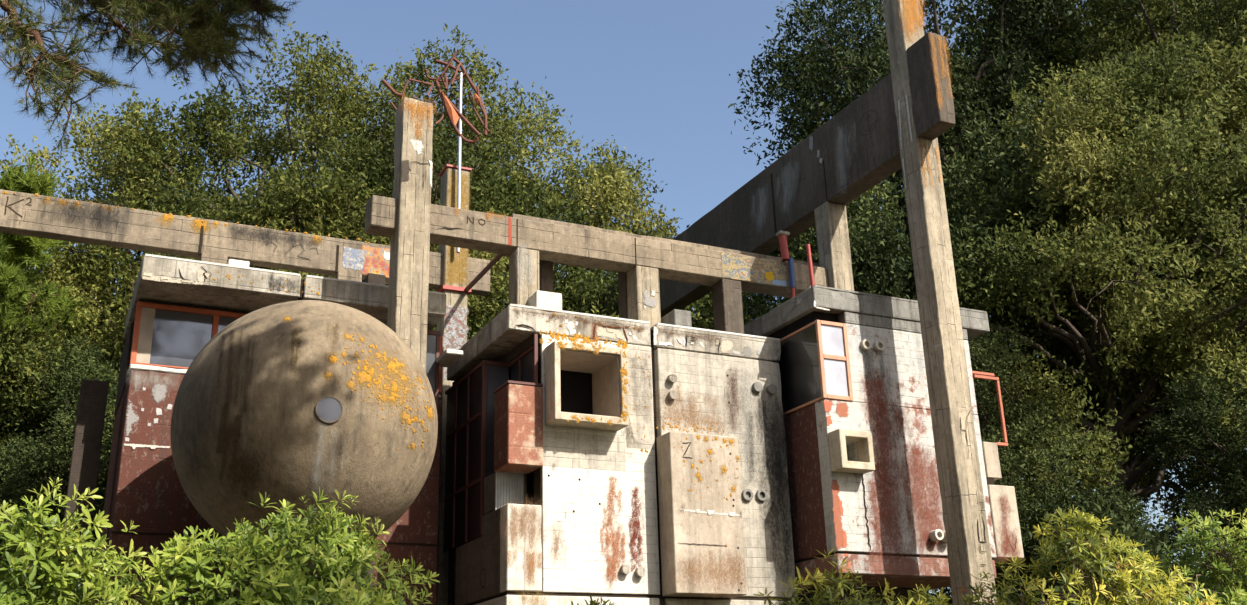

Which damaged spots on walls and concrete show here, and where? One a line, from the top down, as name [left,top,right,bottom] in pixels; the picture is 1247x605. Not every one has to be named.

corrosion [601,477,643,586]
leakage [680,508,740,516]
leakage [720,383,788,572]
corrosion [864,378,942,553]